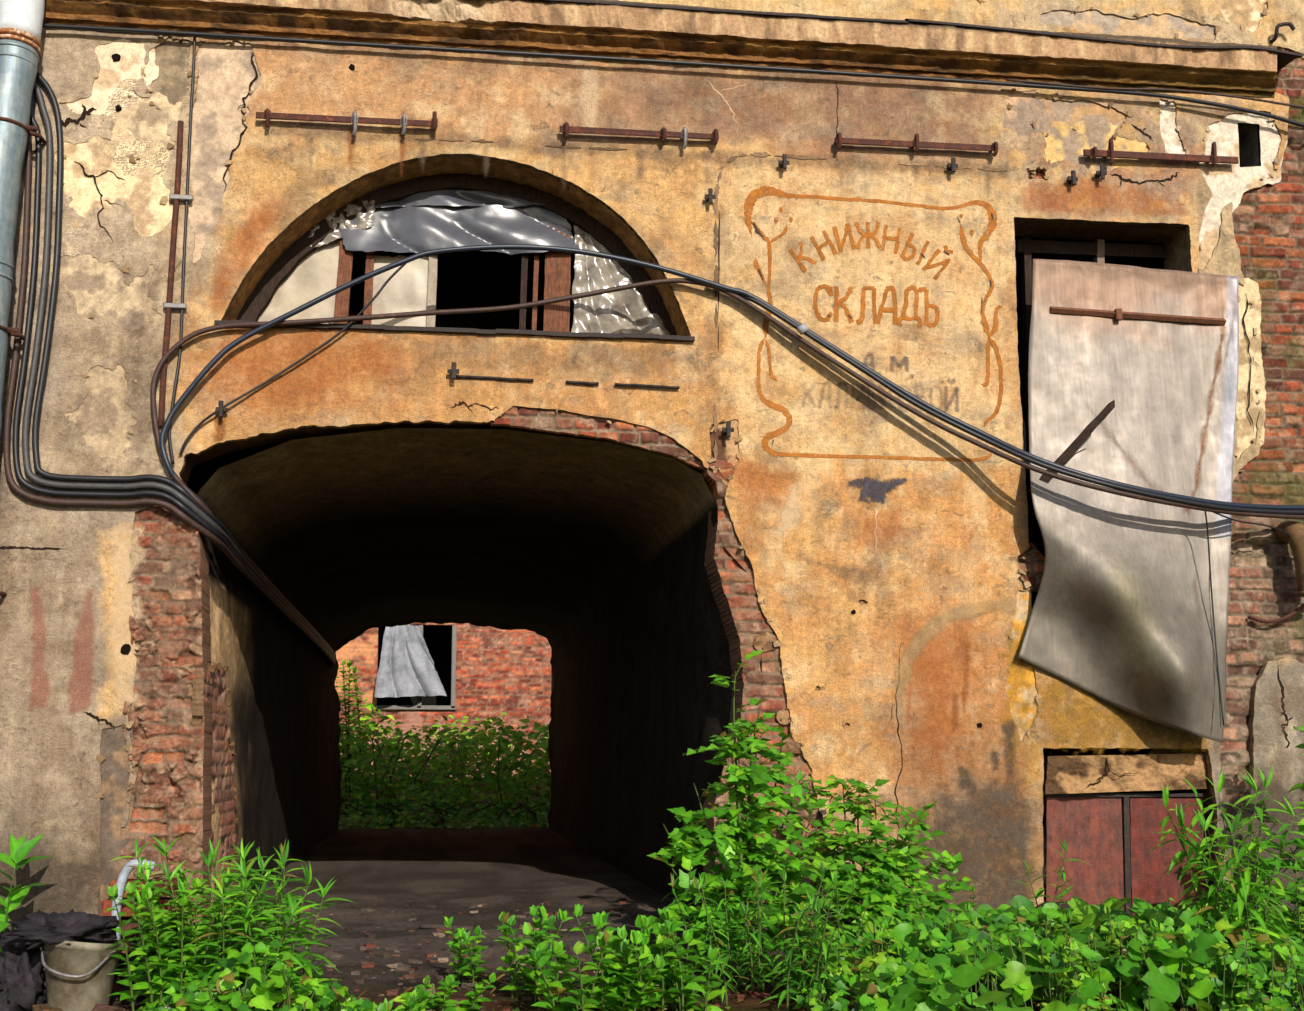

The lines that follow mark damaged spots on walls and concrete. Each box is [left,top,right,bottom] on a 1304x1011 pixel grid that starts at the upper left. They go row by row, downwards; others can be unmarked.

crack [62,104,97,128]
crack [75,161,125,241]
peeling [54,35,261,265]
crack [219,51,258,191]
crack [1110,172,1180,187]
spalling [1003,48,1304,834]
spalling [96,498,239,931]
spalling [490,406,840,915]
crack [890,644,903,839]
crack [1277,665,1293,748]